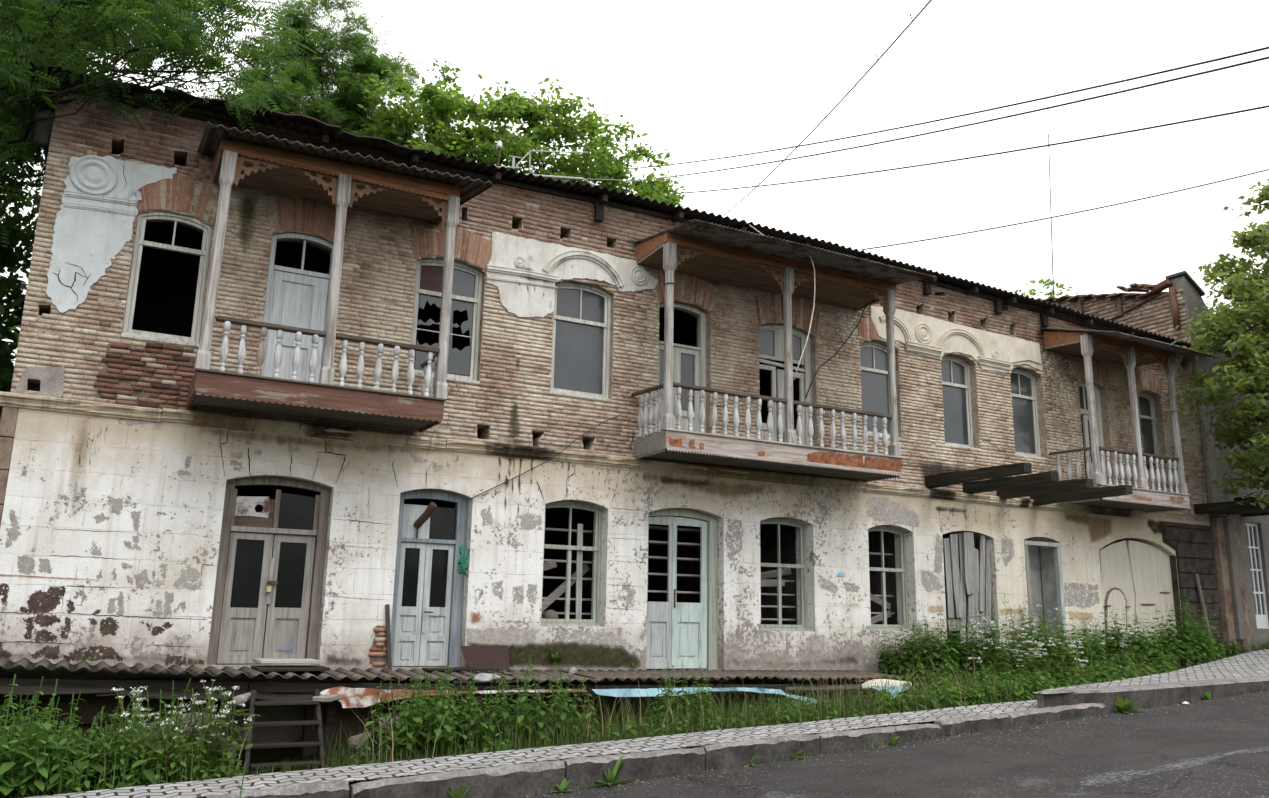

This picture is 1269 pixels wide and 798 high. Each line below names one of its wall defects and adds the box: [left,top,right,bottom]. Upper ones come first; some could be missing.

crack [52,262,91,300]
peeling [480,504,493,527]
peeling [512,512,543,549]
peeling [725,517,743,561]
peeling [867,496,920,528]
peeling [921,533,944,593]
peeling [1001,538,1015,566]
spalling [0,498,202,662]
peeling [492,581,537,604]
peeling [818,574,860,594]
peeling [1064,582,1100,609]
peeling [465,627,537,646]